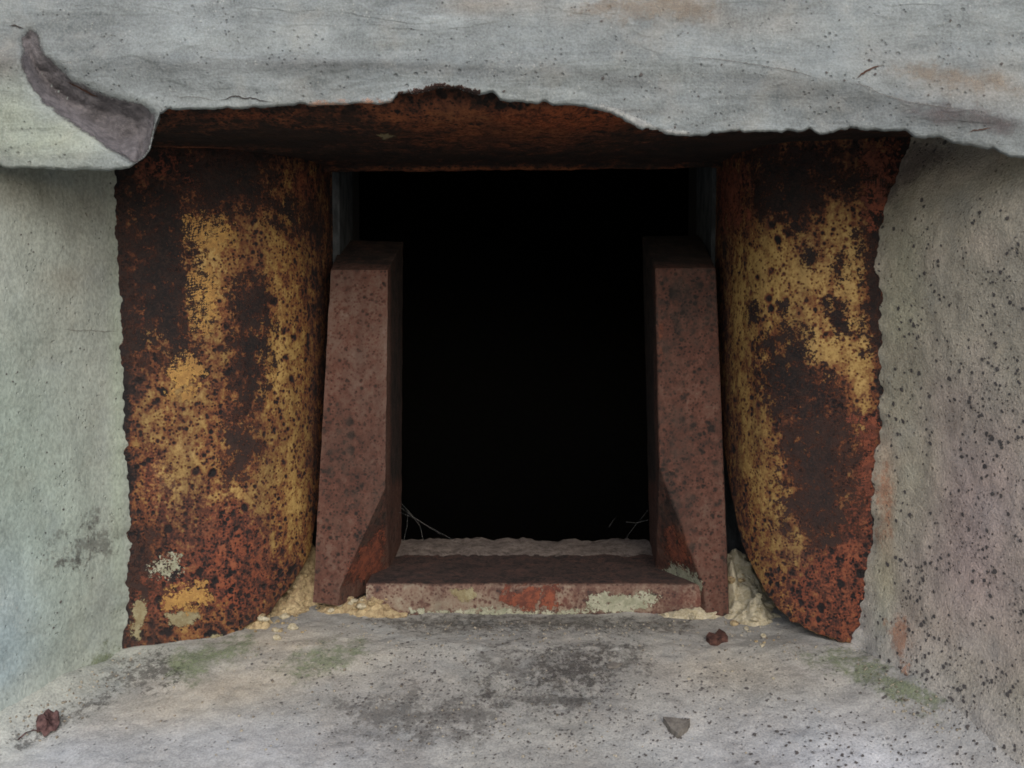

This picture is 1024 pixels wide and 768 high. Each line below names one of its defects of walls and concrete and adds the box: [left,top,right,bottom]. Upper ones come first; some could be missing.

spalling [21,30,157,163]
spalling [397,82,481,95]
spalling [596,104,689,135]
rust [253,184,318,239]
rust [114,166,286,491]
rust [743,137,908,555]
rust [125,521,176,603]
rust [498,583,563,612]